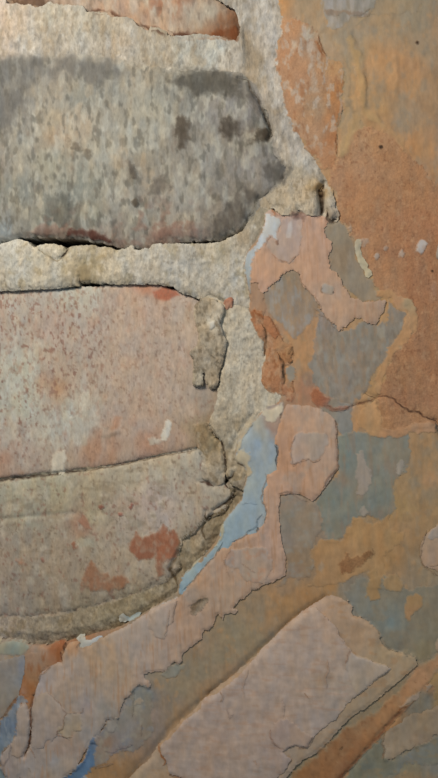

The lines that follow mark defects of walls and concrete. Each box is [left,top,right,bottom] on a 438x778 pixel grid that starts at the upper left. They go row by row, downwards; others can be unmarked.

peeling [320,0,377,30]
spalling [243,16,438,439]
crack [323,395,438,434]
crack [0,449,197,482]
peeling [0,401,438,778]